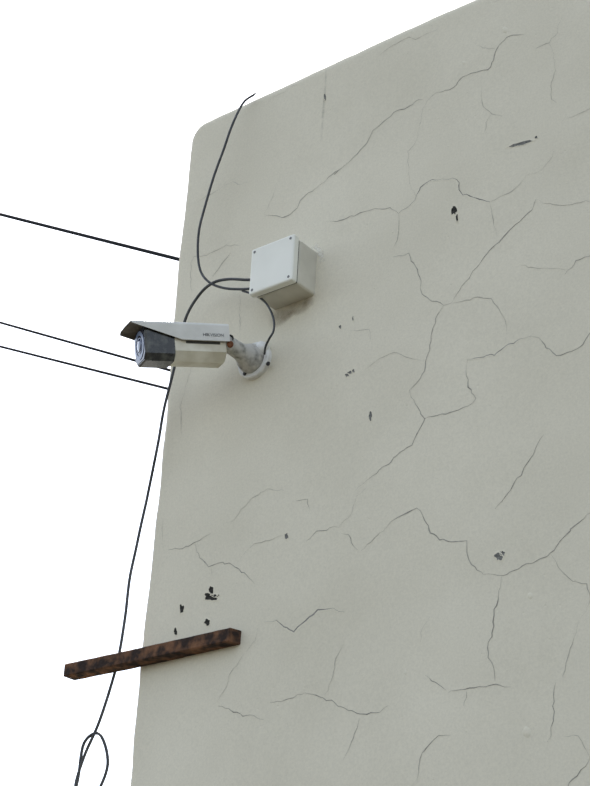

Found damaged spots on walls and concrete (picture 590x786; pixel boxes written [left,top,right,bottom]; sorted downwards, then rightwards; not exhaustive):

crack [268,18,562,218]
spalling [505,135,538,149]
spalling [450,204,459,222]
crack [308,145,590,545]
spalling [202,585,221,602]
crack [170,539,270,579]
flaking render [492,550,506,562]
crack [219,608,344,719]
crack [276,651,387,754]
crack [385,508,590,786]